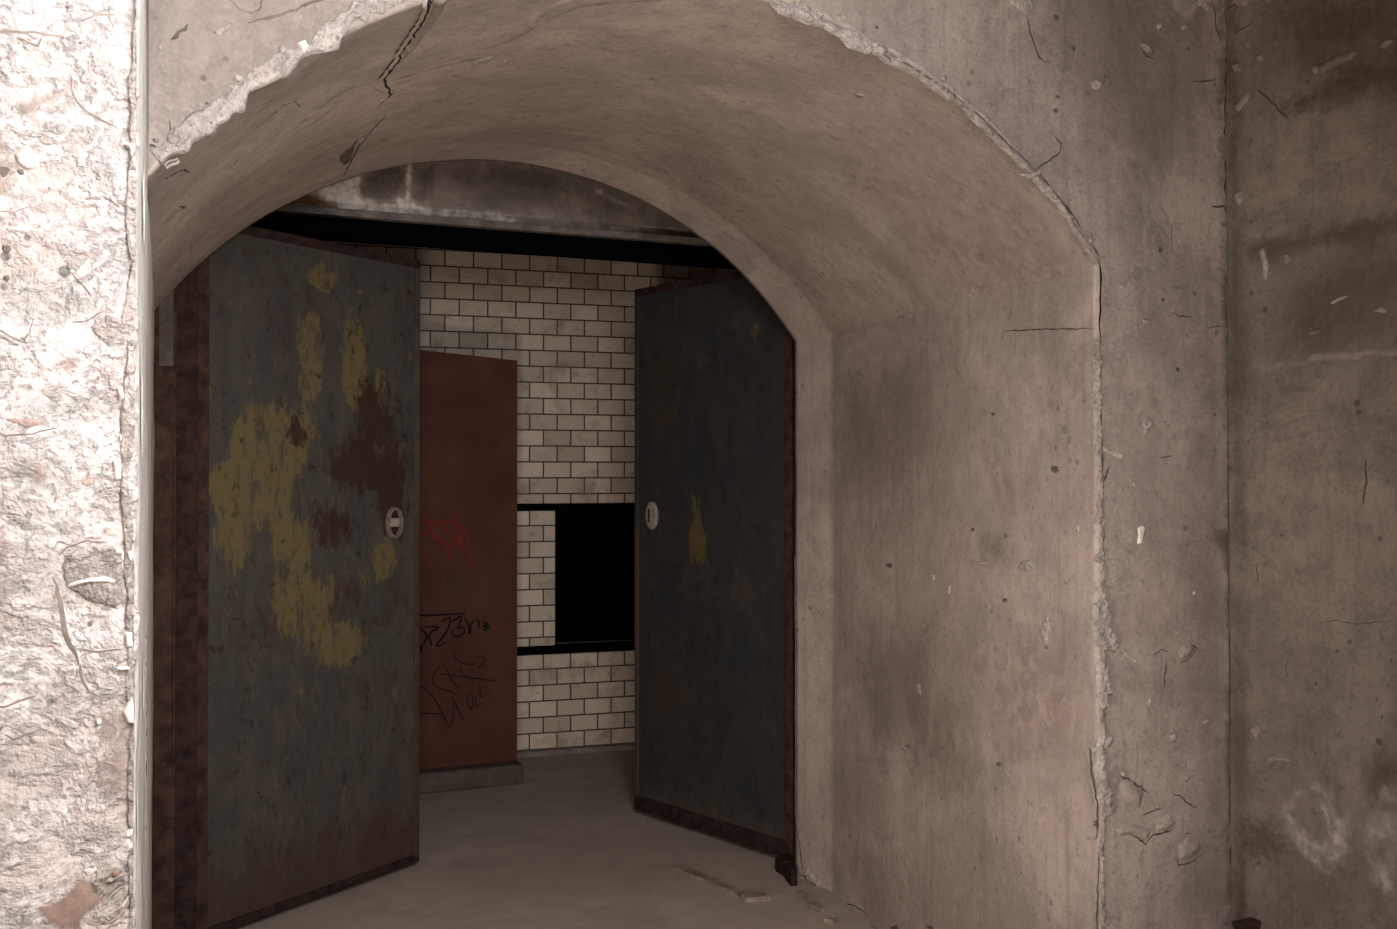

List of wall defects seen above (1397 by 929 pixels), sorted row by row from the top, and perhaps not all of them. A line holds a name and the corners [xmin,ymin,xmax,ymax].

flaking render [0,145,39,178]
crack [341,0,434,178]
spalling [768,0,1101,265]
spalling [0,417,58,437]
spalling [1076,339,1136,929]